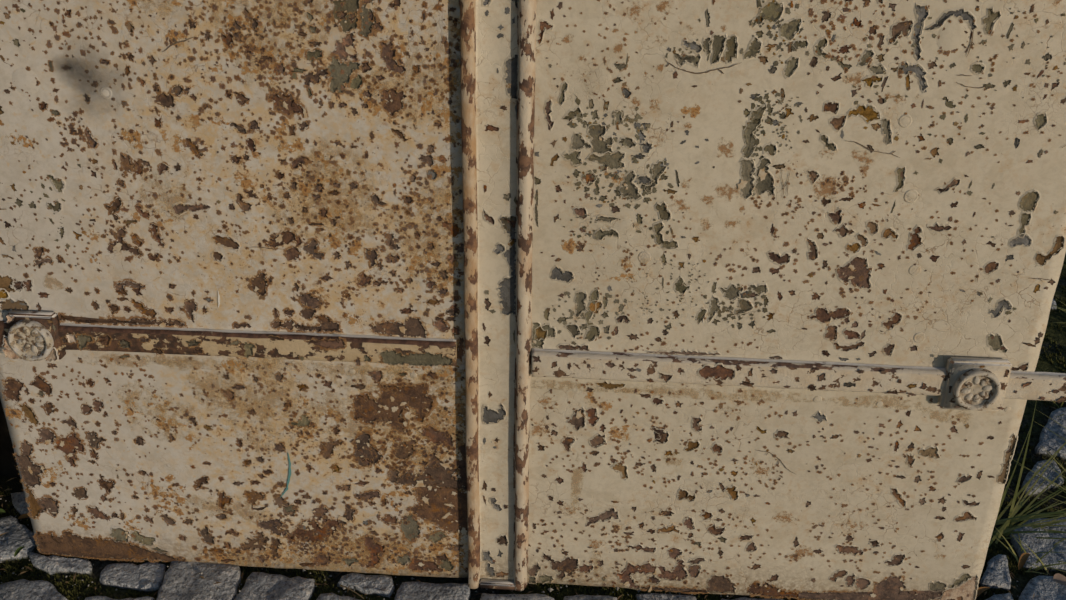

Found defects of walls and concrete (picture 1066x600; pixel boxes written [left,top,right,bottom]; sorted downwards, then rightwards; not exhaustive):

rust [208,0,307,85]
rust [161,114,230,152]
rust [378,16,463,222]
peeling [497,53,519,118]
rust [318,195,361,256]
peeling [0,0,468,574]
peeling [482,193,517,346]
peeling [527,0,1066,600]
peeling [481,391,507,449]
rust [33,360,468,576]
peeling [482,534,510,578]
rust [746,575,946,600]